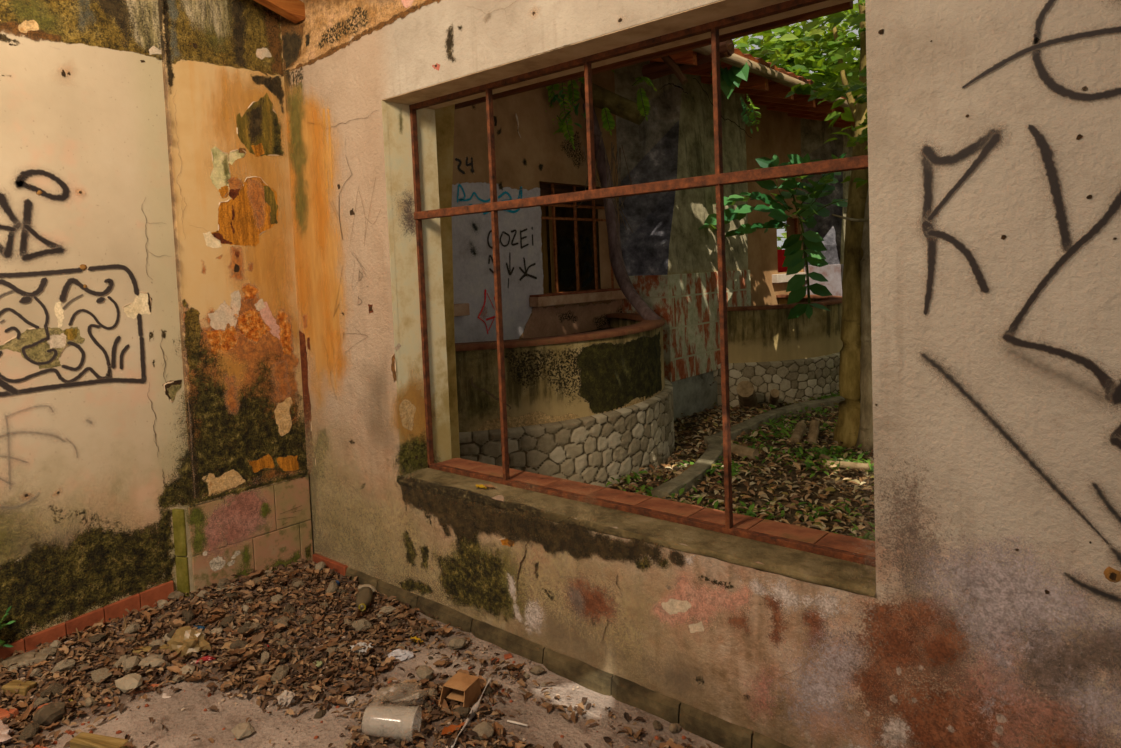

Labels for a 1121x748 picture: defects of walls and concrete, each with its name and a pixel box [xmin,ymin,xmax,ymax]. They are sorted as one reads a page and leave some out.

peeling [283,0,441,72]
peeling [203,93,283,248]
spalling [299,314,316,478]
water stain [0,492,137,569]
water stain [149,324,681,678]
water stain [698,462,1121,748]